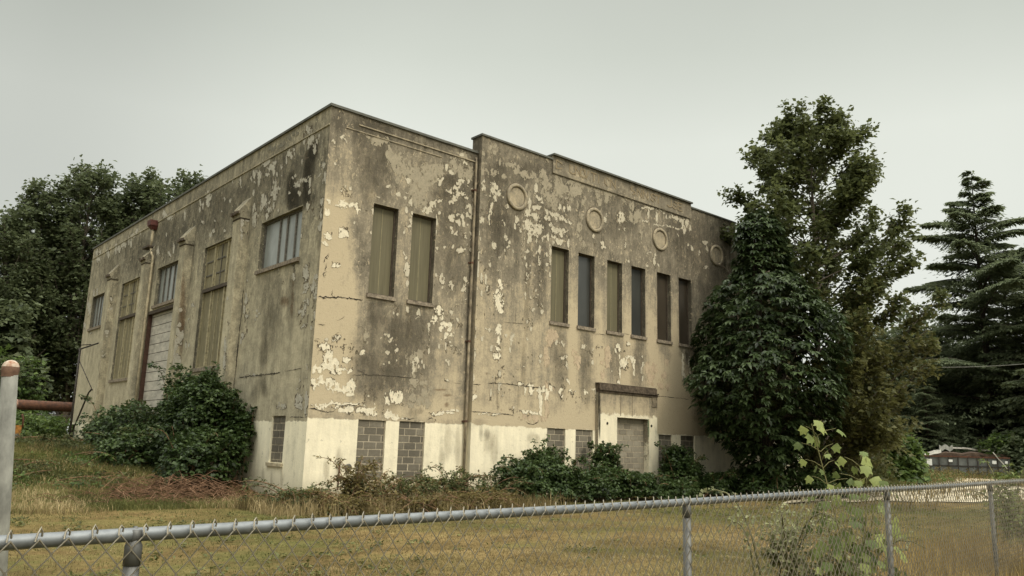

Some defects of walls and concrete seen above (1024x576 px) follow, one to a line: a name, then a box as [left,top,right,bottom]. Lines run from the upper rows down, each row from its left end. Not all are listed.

leakage [286,143,318,210]
crack [318,255,363,339]
peeling [232,125,709,421]